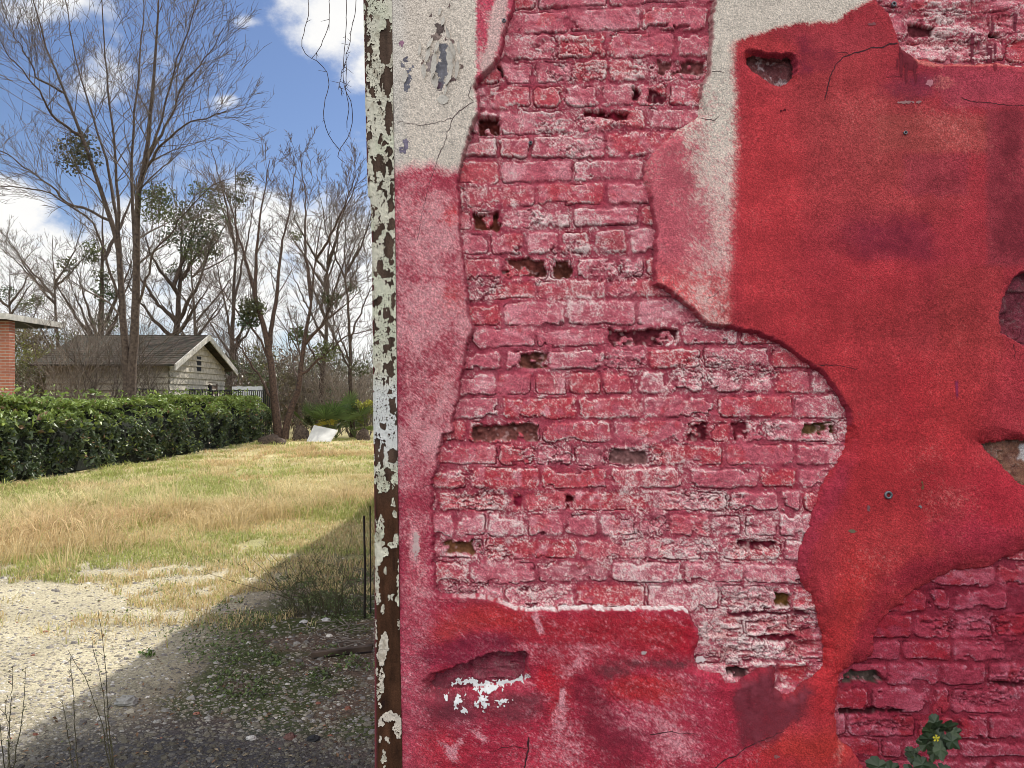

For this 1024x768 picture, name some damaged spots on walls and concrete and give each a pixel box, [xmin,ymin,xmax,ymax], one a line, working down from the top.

spalling [876,0,1024,67]
crack [825,43,898,98]
spalling [999,273,1024,345]
spalling [432,0,847,694]
peeling [363,0,464,768]
spalling [981,440,1024,485]
spalling [834,550,1024,768]